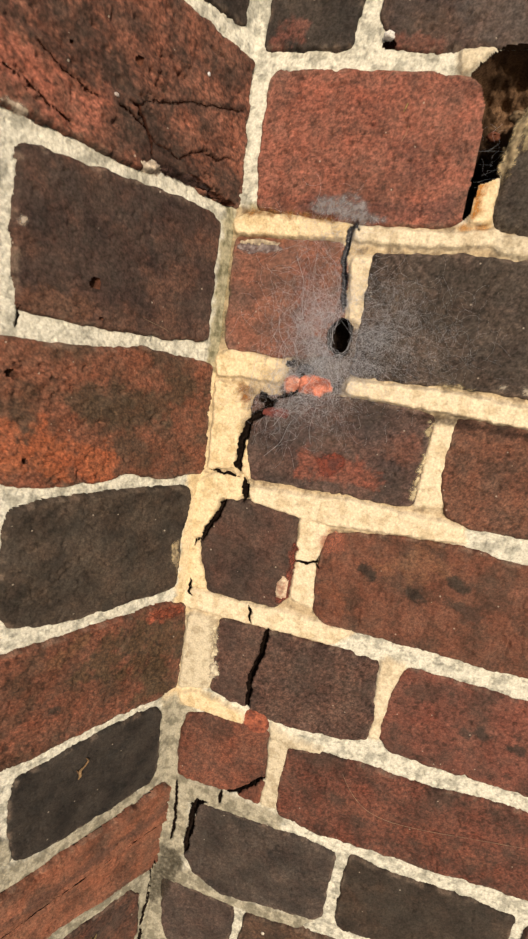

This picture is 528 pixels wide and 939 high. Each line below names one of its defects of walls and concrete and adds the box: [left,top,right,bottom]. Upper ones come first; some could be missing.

crack [1,61,71,122]
crack [37,38,98,96]
crack [119,99,243,206]
spalling [462,43,528,220]
crack [341,223,359,312]
crack [195,368,306,544]
crack [245,605,269,706]
crack [1,777,265,939]